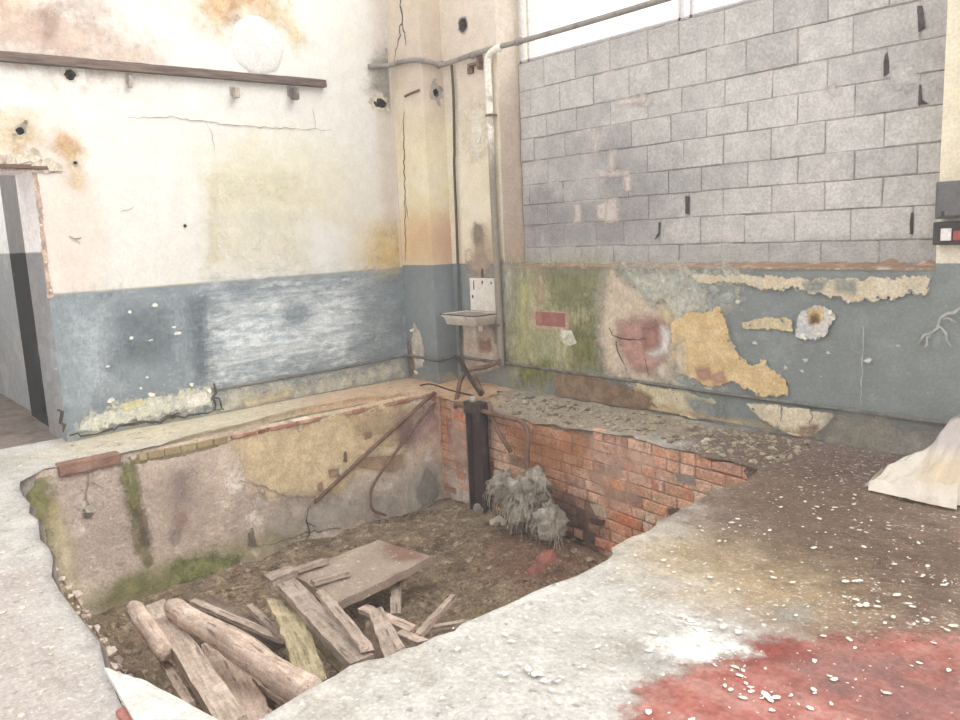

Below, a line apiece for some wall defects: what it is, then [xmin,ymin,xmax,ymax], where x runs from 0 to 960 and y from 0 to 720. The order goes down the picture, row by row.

crack [394,0,406,60]
crack [129,108,325,150]
crack [402,117,410,262]
peeling [75,323,425,432]
water stain [465,225,603,385]
peeling [554,265,931,439]
crack [918,307,960,348]
crack [240,480,341,545]
spalling [35,389,748,719]
peeling [823,556,958,631]
peeling [653,586,814,717]
peeling [791,648,871,705]